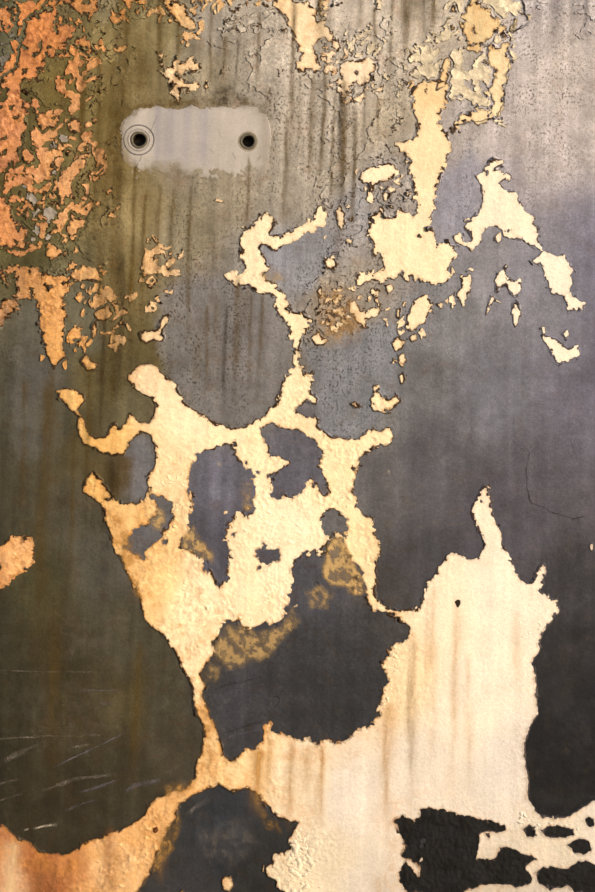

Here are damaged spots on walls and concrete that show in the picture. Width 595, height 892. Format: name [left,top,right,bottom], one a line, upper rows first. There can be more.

peeling [0,0,235,372]
water stain [310,86,356,178]
peeling [218,0,586,314]
peeling [573,0,595,39]
corrosion [184,531,212,559]
peeling [0,205,595,892]